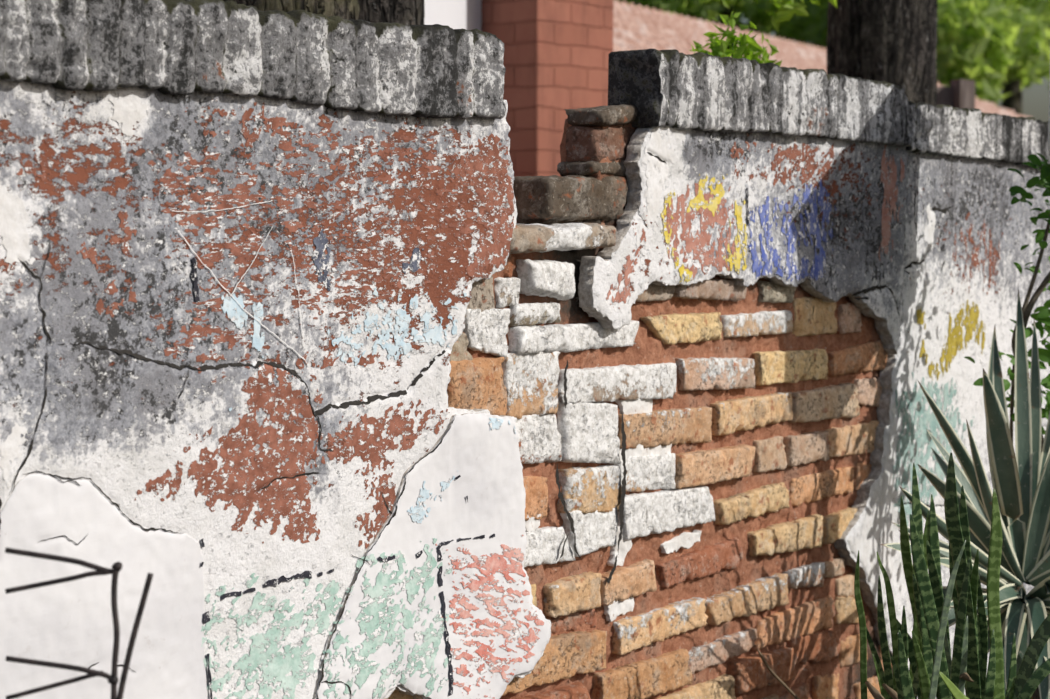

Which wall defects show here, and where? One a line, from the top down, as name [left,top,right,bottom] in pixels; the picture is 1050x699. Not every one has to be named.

peeling [17,140,60,181]
flaking render [106,91,147,137]
flaking render [0,184,35,287]
peeling [76,210,137,317]
crack [0,241,447,534]
crack [561,360,569,409]
flaking render [135,99,1000,699]
crack [556,464,580,560]
crack [607,405,627,586]